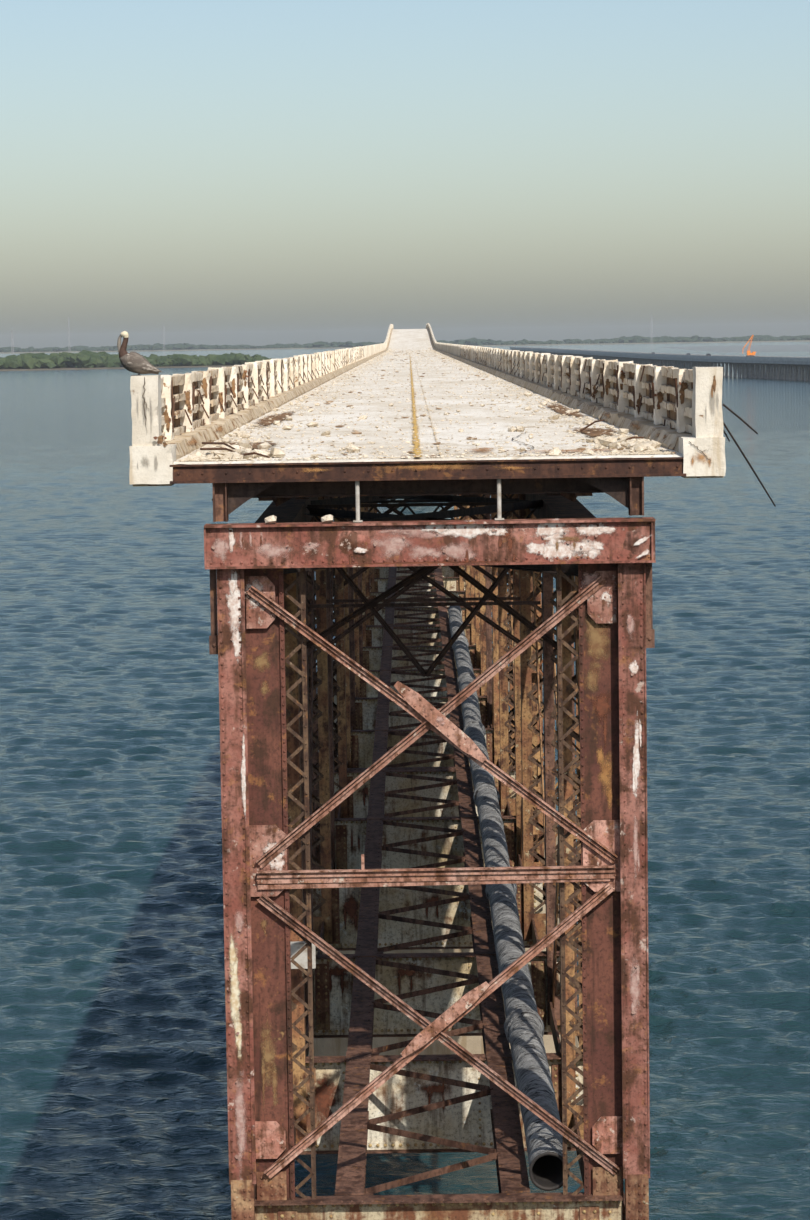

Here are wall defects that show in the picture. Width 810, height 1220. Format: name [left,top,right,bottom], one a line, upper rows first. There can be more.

peeling [527,519,615,562]
peeling [211,528,290,656]
corrosion [255,653,269,693]
corrosion [586,616,612,804]
corrosion [341,892,358,930]
corrosion [329,966,348,996]
corrosion [261,1030,277,1104]
corrosion [316,1075,340,1122]
corrosion [420,1083,451,1112]